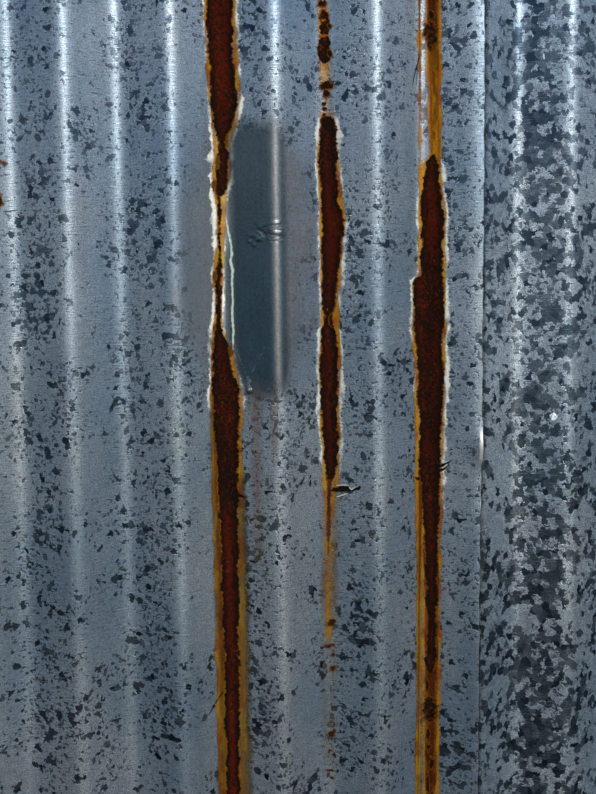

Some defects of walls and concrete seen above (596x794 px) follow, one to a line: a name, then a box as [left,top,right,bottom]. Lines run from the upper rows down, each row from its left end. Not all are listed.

corrosion [202,0,252,794]
corrosion [315,0,348,671]
corrosion [410,0,452,794]